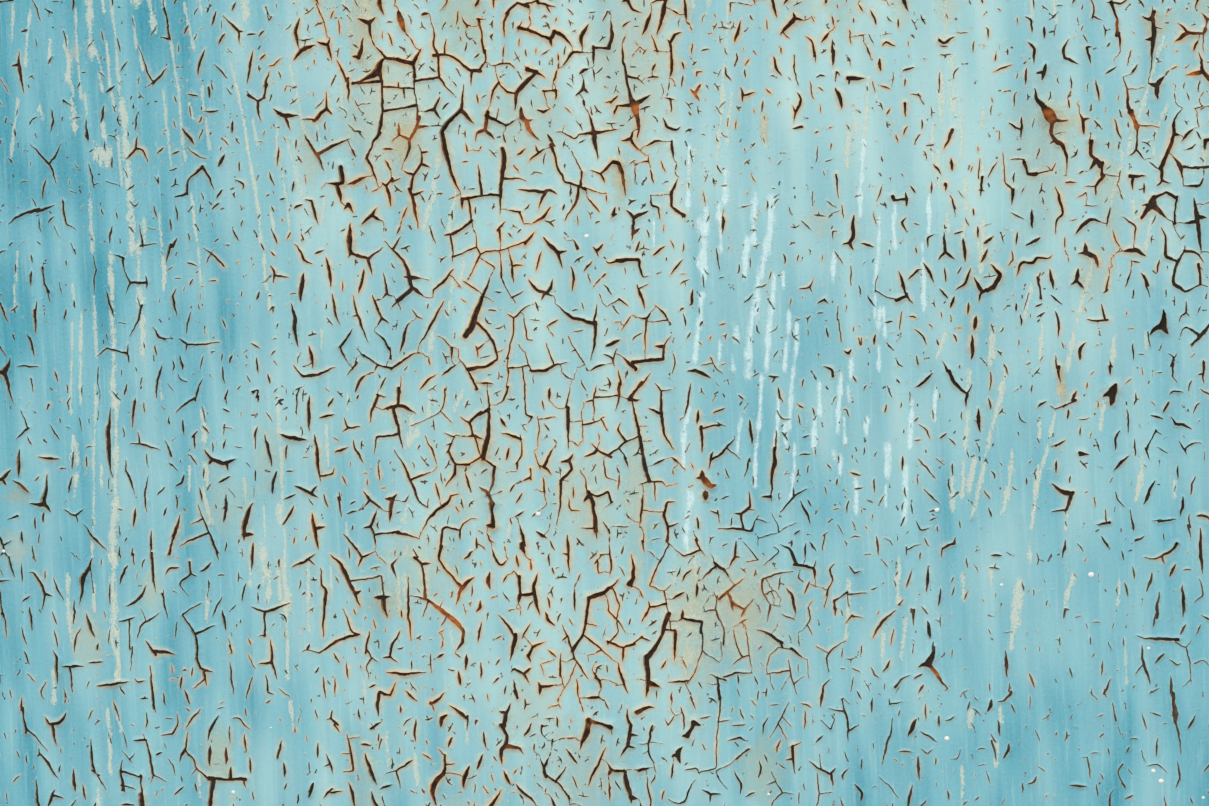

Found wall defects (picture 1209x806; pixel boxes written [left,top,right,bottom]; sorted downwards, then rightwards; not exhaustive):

crack [30,0,80,50]
crack [9,48,36,97]
crack [88,200,123,247]
crack [112,249,154,298]
crack [706,208,763,290]
crack [0,290,21,342]
crack [43,367,74,412]
crack [717,0,1209,806]
crack [41,416,72,445]
crack [264,556,284,573]
crack [81,731,112,799]
crack [273,736,292,792]